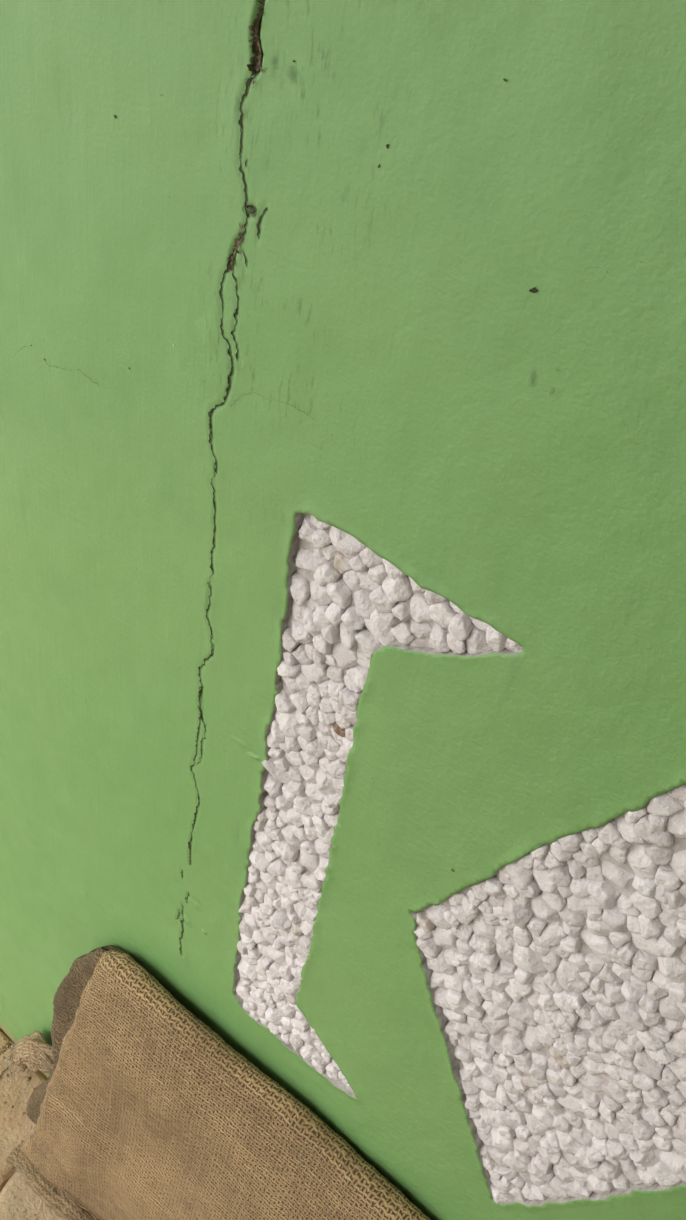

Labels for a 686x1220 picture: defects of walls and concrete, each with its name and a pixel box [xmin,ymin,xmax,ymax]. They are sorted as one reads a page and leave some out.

crack [176,0,267,955]